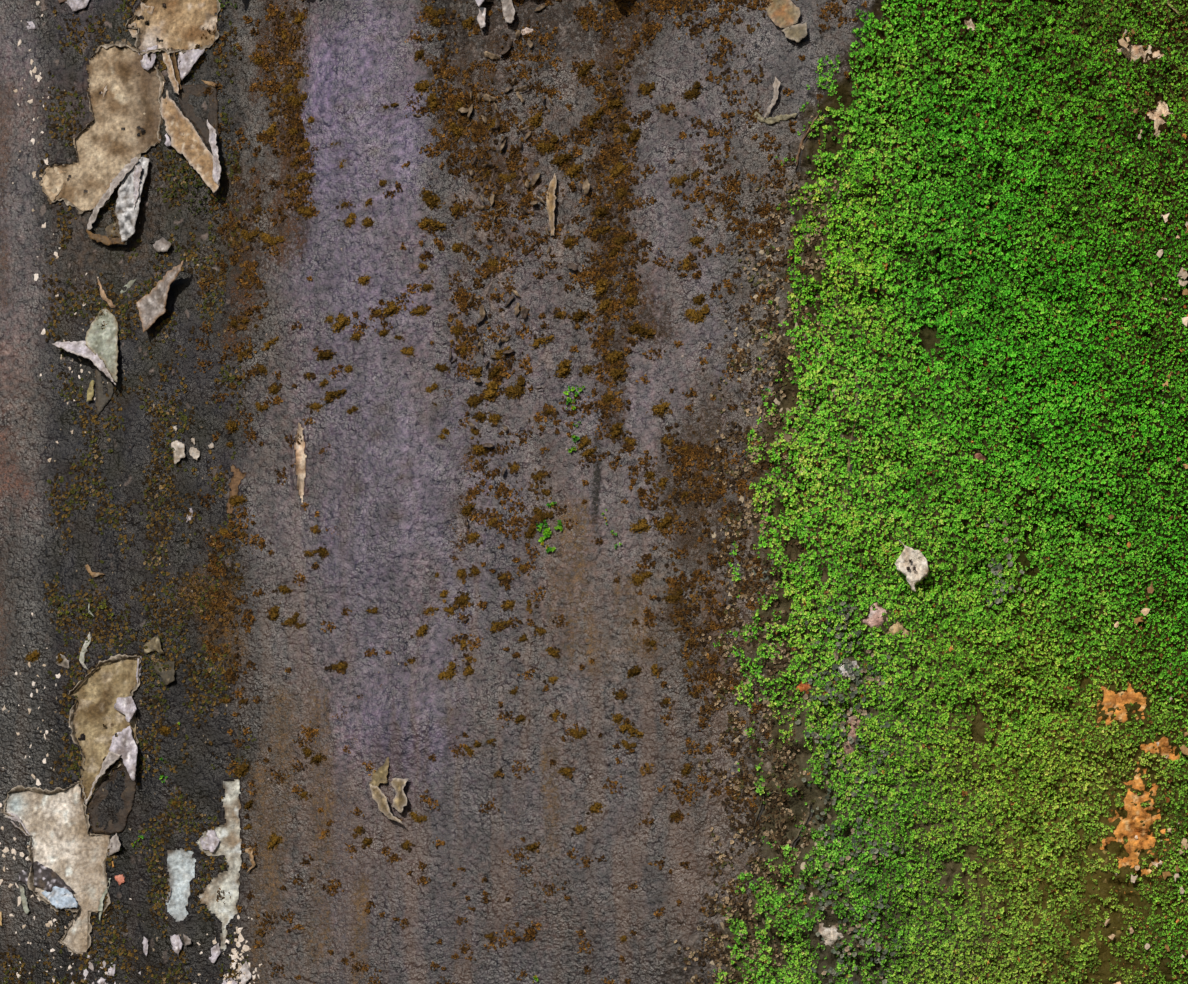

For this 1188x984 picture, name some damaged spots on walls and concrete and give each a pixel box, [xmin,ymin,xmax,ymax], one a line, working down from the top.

peeling [475,0,486,28]
peeling [501,0,534,36]
leakage [429,0,664,68]
peeling [39,0,221,246]
peeling [153,237,171,252]
peeling [136,260,184,333]
peeling [53,278,137,416]
leakage [552,435,601,665]
peeling [0,632,175,956]
peeling [369,757,409,824]
peeling [162,779,256,964]
peeling [97,964,116,984]